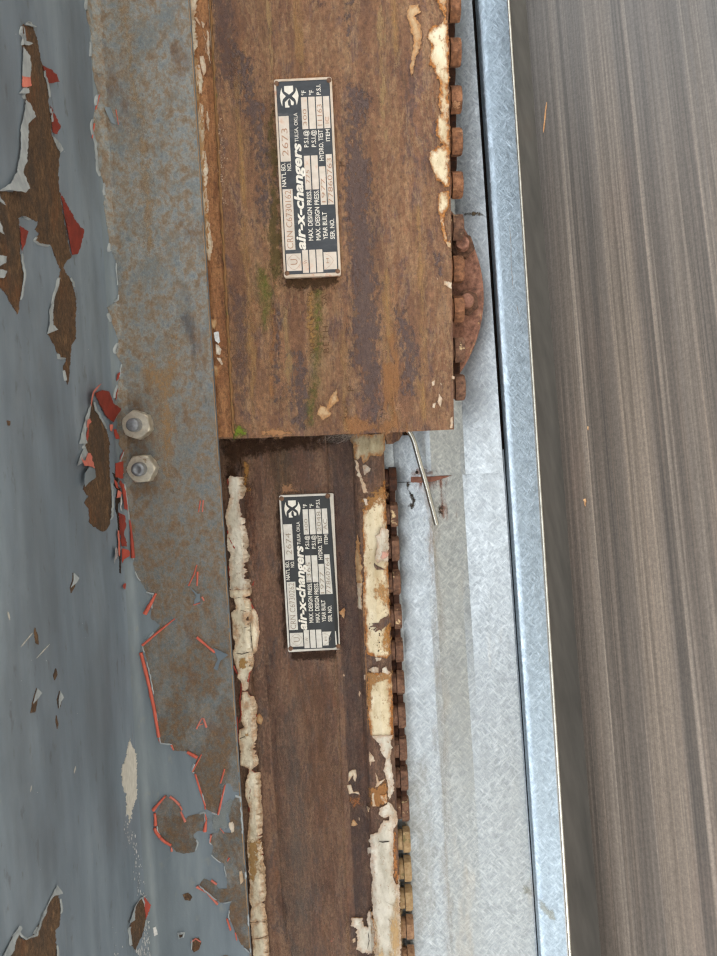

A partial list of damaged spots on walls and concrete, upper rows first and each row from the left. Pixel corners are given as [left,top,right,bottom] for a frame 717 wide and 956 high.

peeling [0,21,84,385]
peeling [78,0,269,956]
corrosion [212,0,278,227]
corrosion [259,291,316,438]
peeling [350,433,385,505]
corrosion [360,480,392,658]
corrosion [339,76,425,436]
peeling [407,0,451,248]
peeling [3,885,63,956]
corrosion [350,780,388,808]
peeling [350,735,402,956]
corrosion [366,671,394,740]